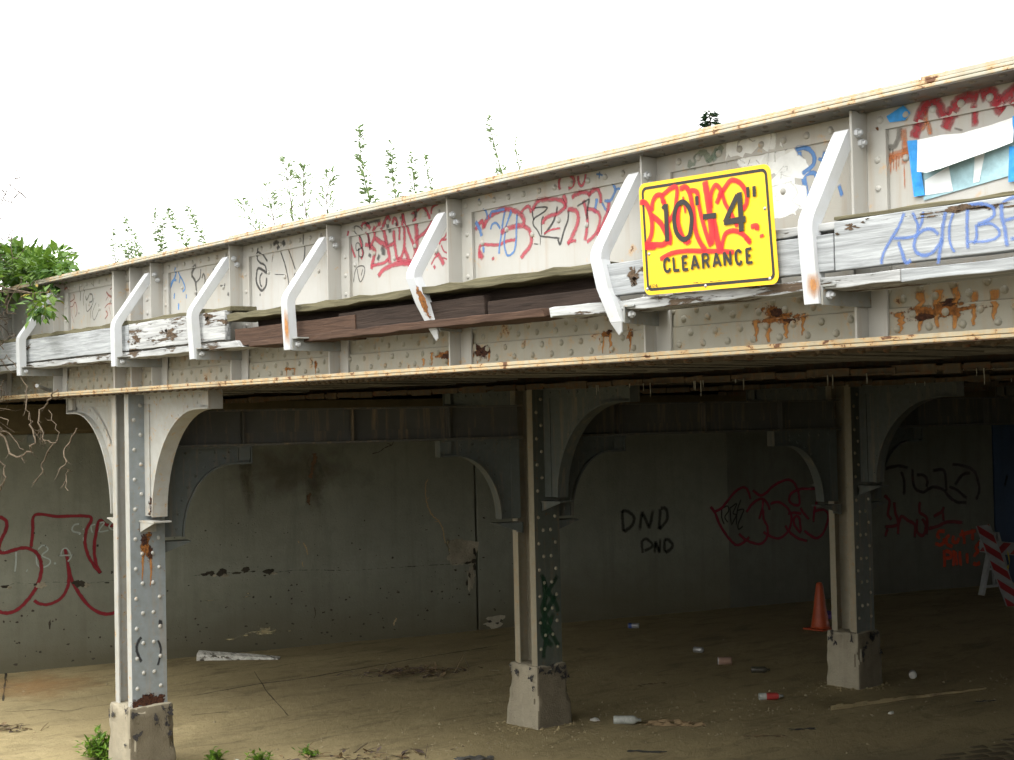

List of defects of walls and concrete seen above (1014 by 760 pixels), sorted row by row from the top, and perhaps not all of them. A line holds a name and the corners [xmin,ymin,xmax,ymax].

corrosion [752,303,805,342]
corrosion [891,286,999,333]
corrosion [473,344,490,363]
corrosion [140,532,153,585]